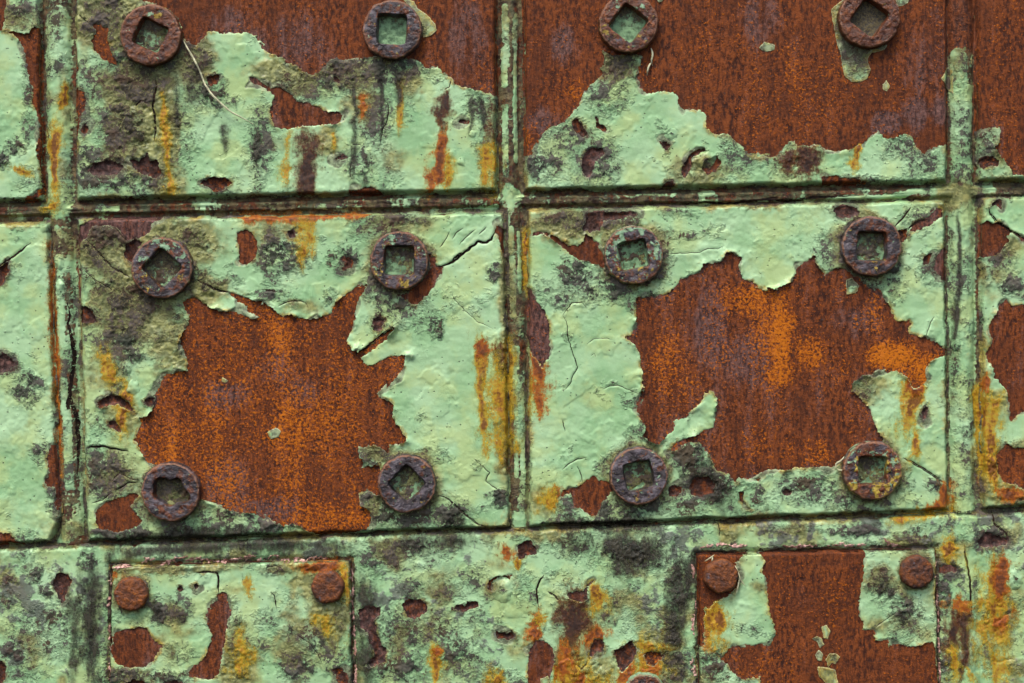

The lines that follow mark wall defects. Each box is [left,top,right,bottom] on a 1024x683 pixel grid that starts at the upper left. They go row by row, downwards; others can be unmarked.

water stain [174,71,200,128]
water stain [252,129,262,166]
rust [423,90,455,200]
peeling [522,0,953,157]
crack [437,227,496,267]
crack [66,303,140,503]
peeling [134,284,406,535]
rust [474,335,555,471]
crack [563,302,609,392]
peeling [625,247,947,482]
rust [895,379,926,462]
water stain [564,514,695,650]